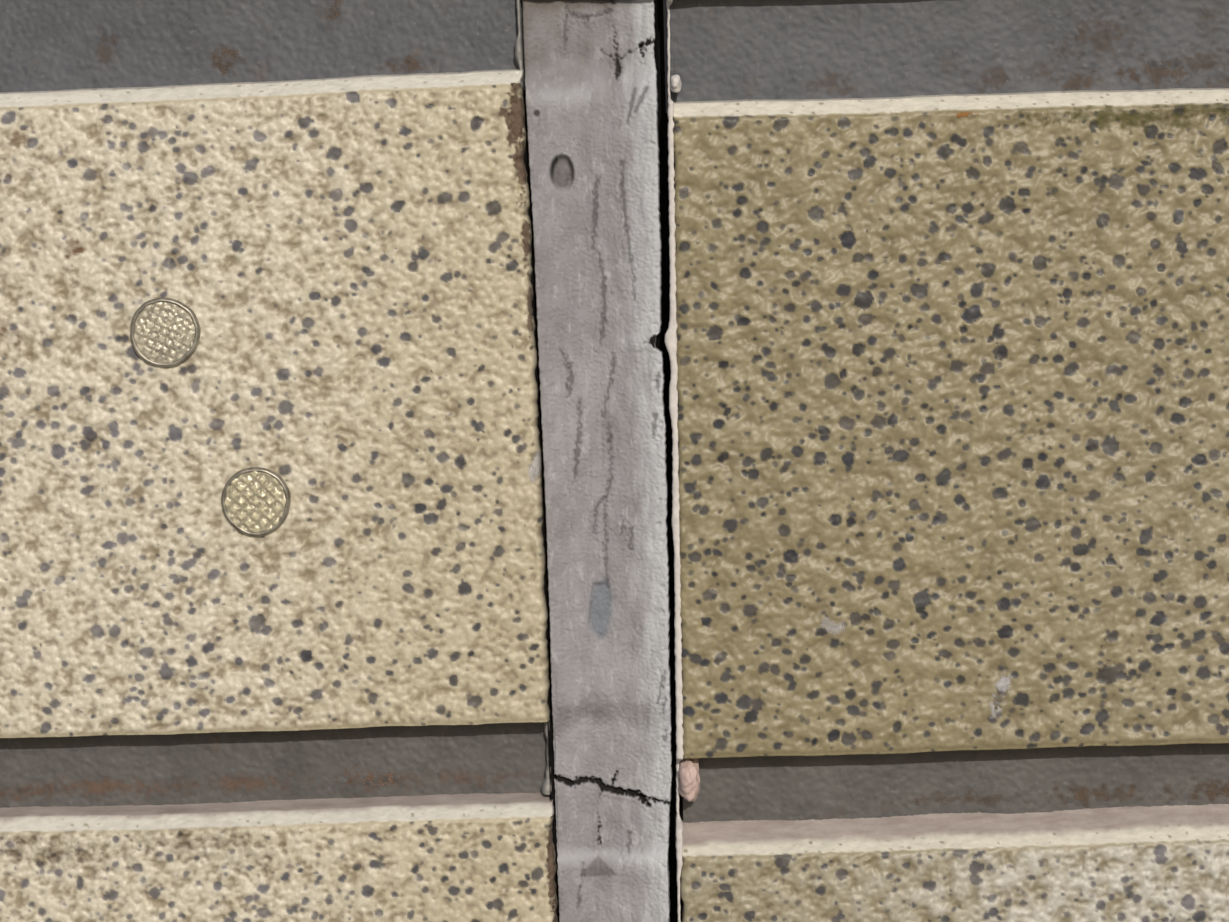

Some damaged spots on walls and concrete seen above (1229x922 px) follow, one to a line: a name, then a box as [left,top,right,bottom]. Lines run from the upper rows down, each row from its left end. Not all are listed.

crack [610,32,631,78]
crack [554,771,670,806]